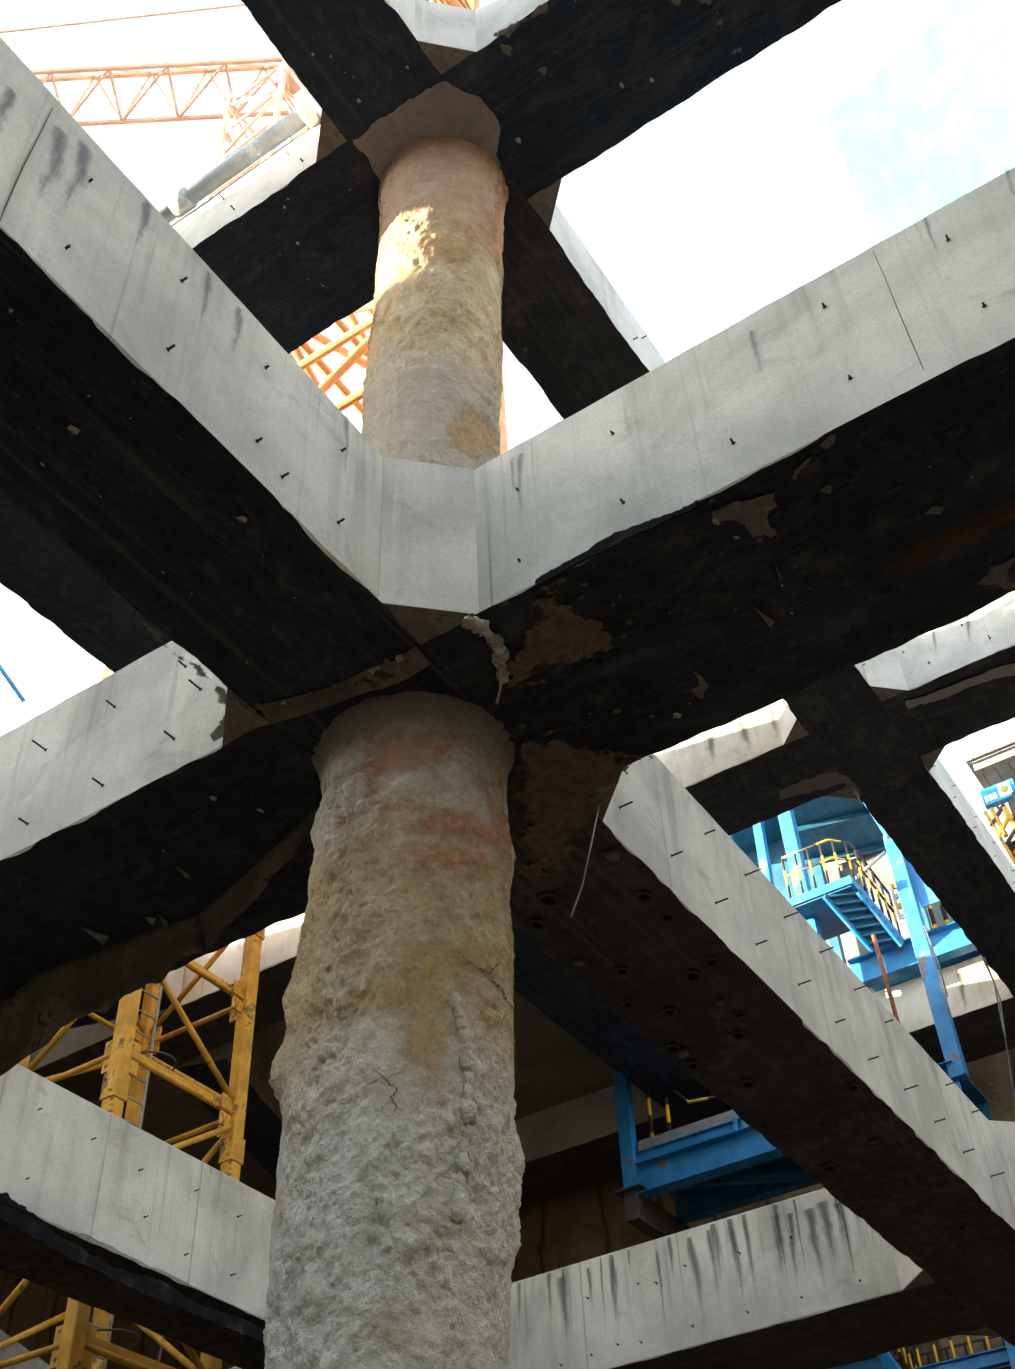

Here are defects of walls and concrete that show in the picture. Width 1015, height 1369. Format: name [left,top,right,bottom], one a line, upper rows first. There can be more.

peeling [702,493,793,555]
peeling [977,558,1015,590]
peeling [460,578,633,704]
peeling [905,663,1015,709]
peeling [508,724,653,893]
leakage [547,1269,566,1314]
leakage [587,1251,630,1292]
leakage [688,1214,750,1282]
leakage [773,1198,848,1252]